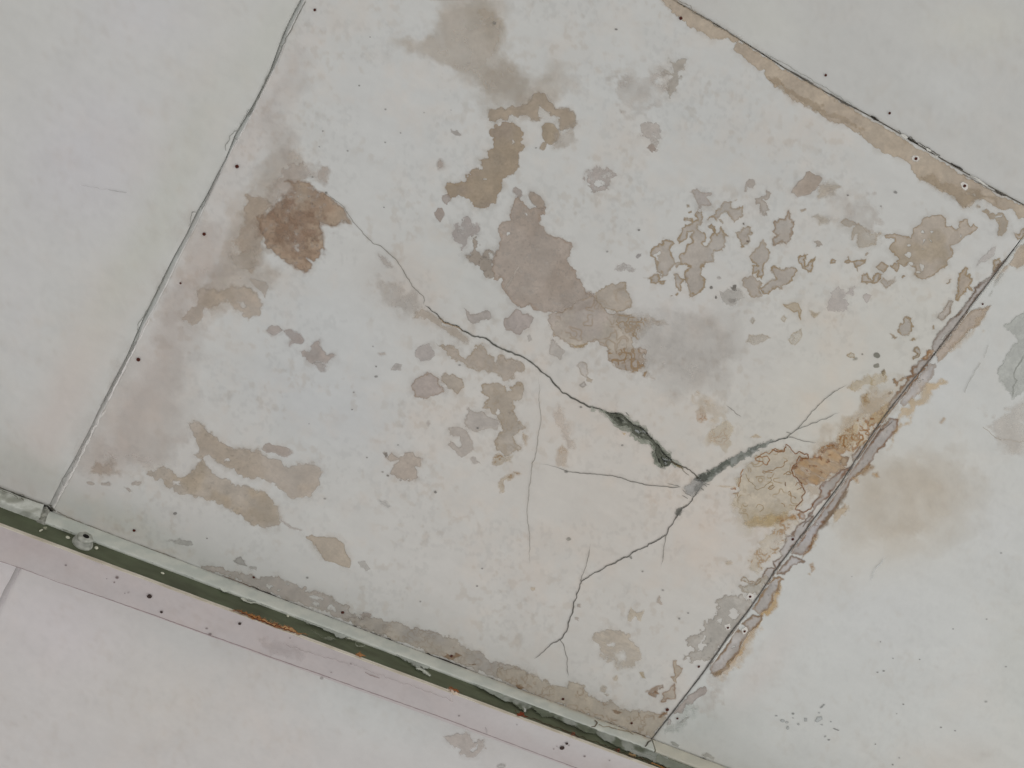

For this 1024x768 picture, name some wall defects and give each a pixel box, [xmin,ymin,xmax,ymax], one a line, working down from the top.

water stain [182,253,267,325]
peeling [997,313,1024,399]
crack [331,197,843,672]
crack [591,244,1021,747]
water stain [733,413,883,569]
peeling [684,259,1006,676]
rust [233,610,307,635]
crack [222,575,329,617]
peeling [474,683,692,768]